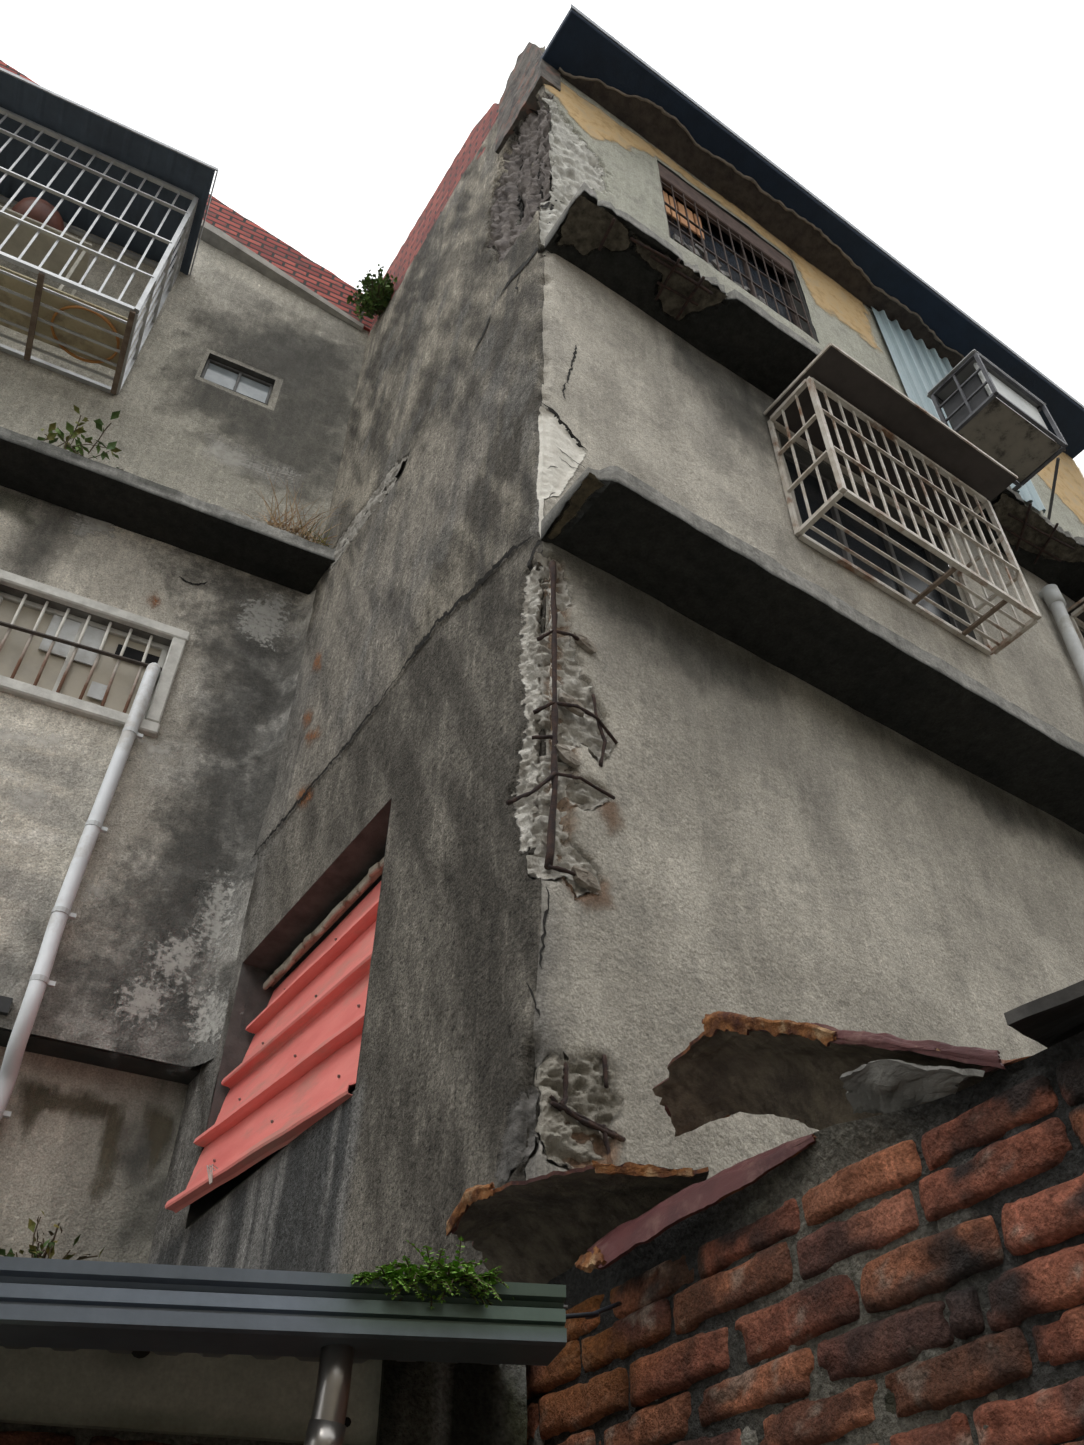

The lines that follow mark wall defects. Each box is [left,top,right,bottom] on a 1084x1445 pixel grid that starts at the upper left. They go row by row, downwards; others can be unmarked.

spalling [487,94,606,263]
peeling [558,68,965,359]
peeling [541,402,588,451]
leakage [77,548,299,1044]
crack [252,536,541,858]
spalling [506,552,618,903]
leakage [22,1083,173,1192]
spalling [533,1051,626,1169]